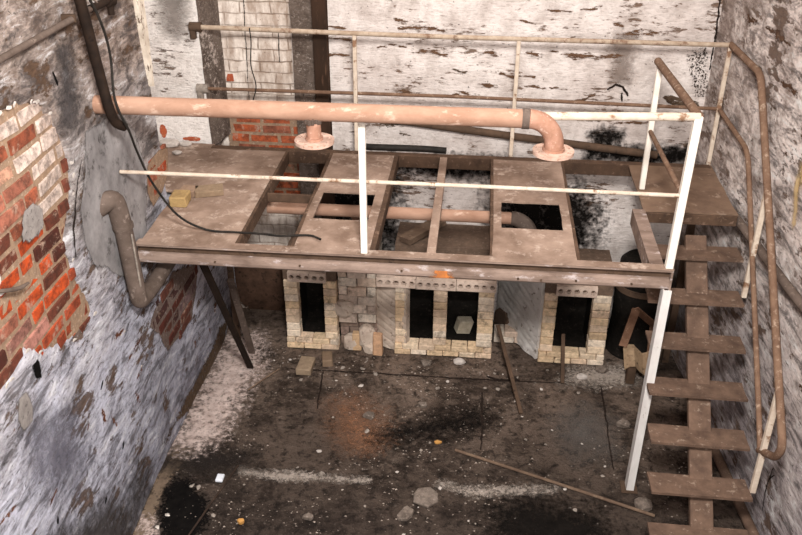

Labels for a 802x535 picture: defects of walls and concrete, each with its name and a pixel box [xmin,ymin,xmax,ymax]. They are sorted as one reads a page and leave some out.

peeling [395,18,445,33]
peeling [614,22,660,38]
crack [709,0,721,70]
peeling [743,14,791,46]
peeling [377,44,448,57]
peeling [525,50,625,60]
peeling [452,72,567,96]
flaking render [228,118,298,148]
flaking render [274,163,301,194]
flaking render [0,99,97,389]
flaking render [150,265,198,351]